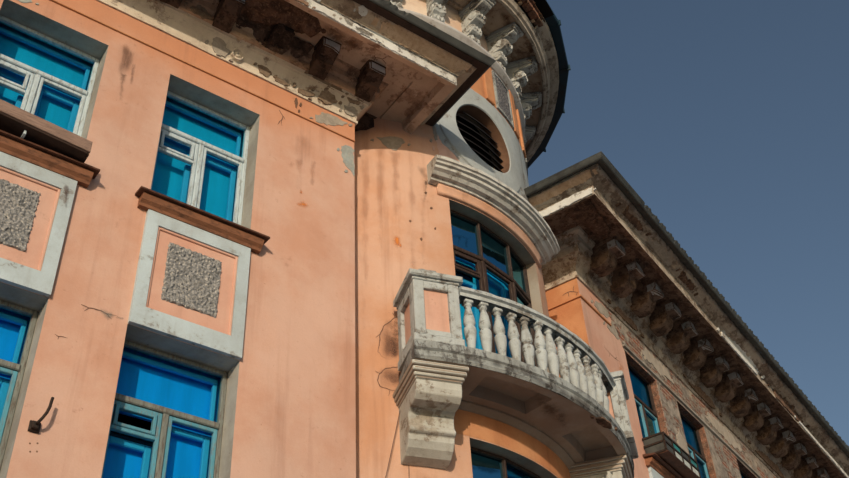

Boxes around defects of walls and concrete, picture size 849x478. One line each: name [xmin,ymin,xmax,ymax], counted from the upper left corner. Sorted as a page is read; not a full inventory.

spalling [204,0,380,127]
peeling [337,145,355,176]
peeling [370,136,411,151]
spalling [615,202,652,236]
spalling [676,268,698,296]
crack [376,312,398,396]
flaking render [590,299,777,478]